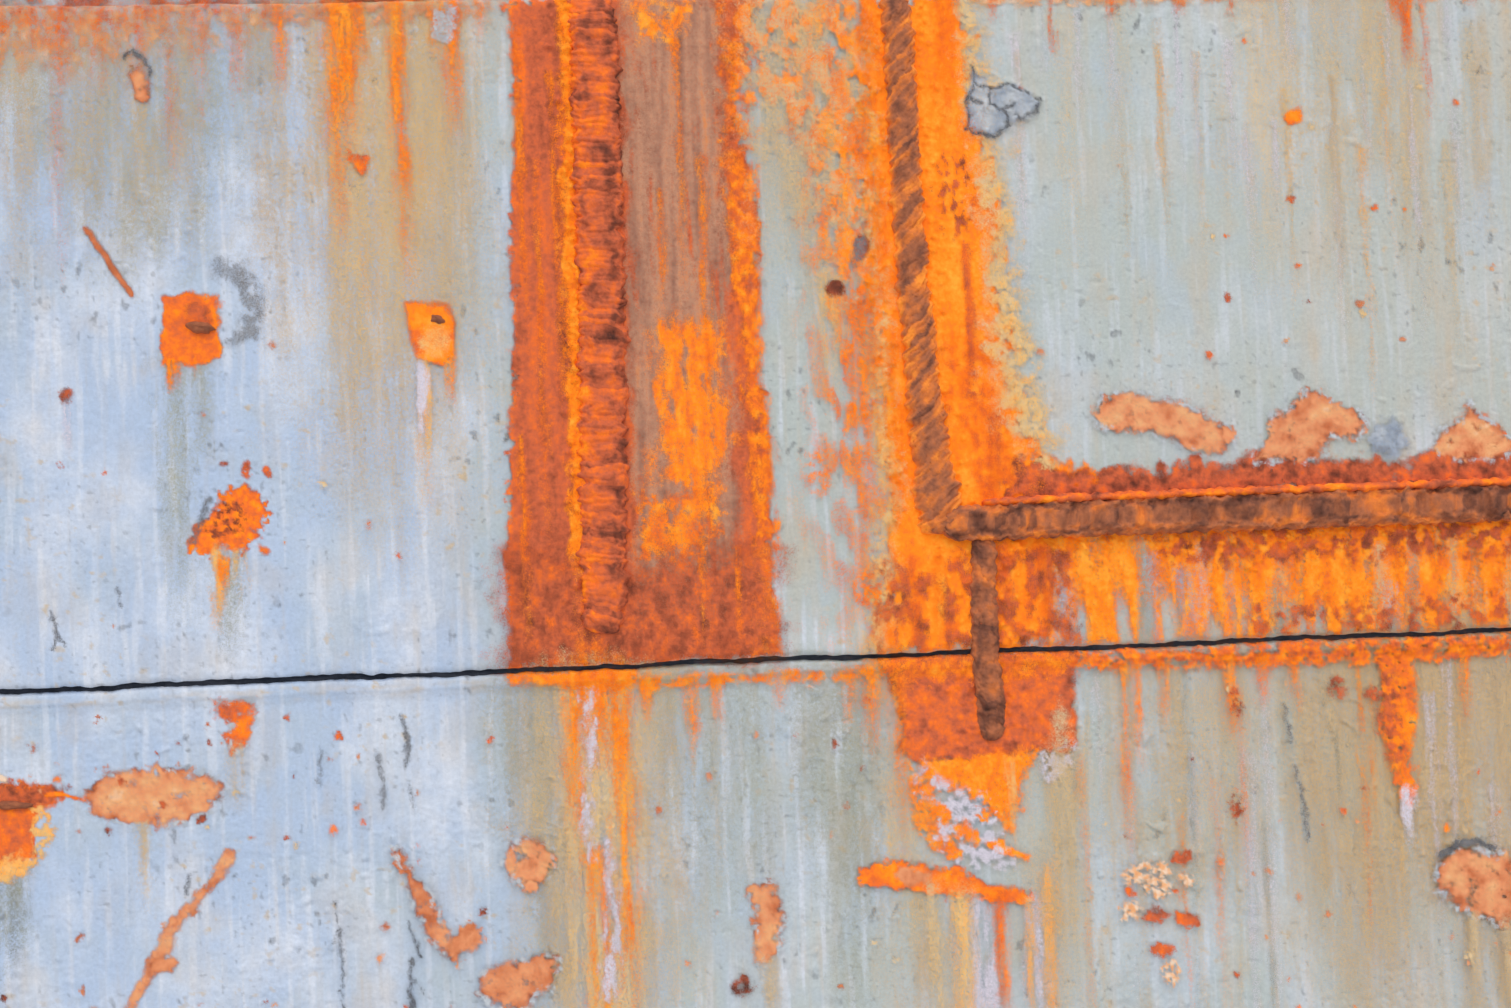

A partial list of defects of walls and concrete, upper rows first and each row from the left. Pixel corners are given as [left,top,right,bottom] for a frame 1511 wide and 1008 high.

rust [906,0,1511,506]
peeling [1089,386,1413,468]
peeling [1433,399,1511,466]
peeling [385,845,565,1008]
peeling [498,834,558,893]
peeling [1432,838,1511,1008]